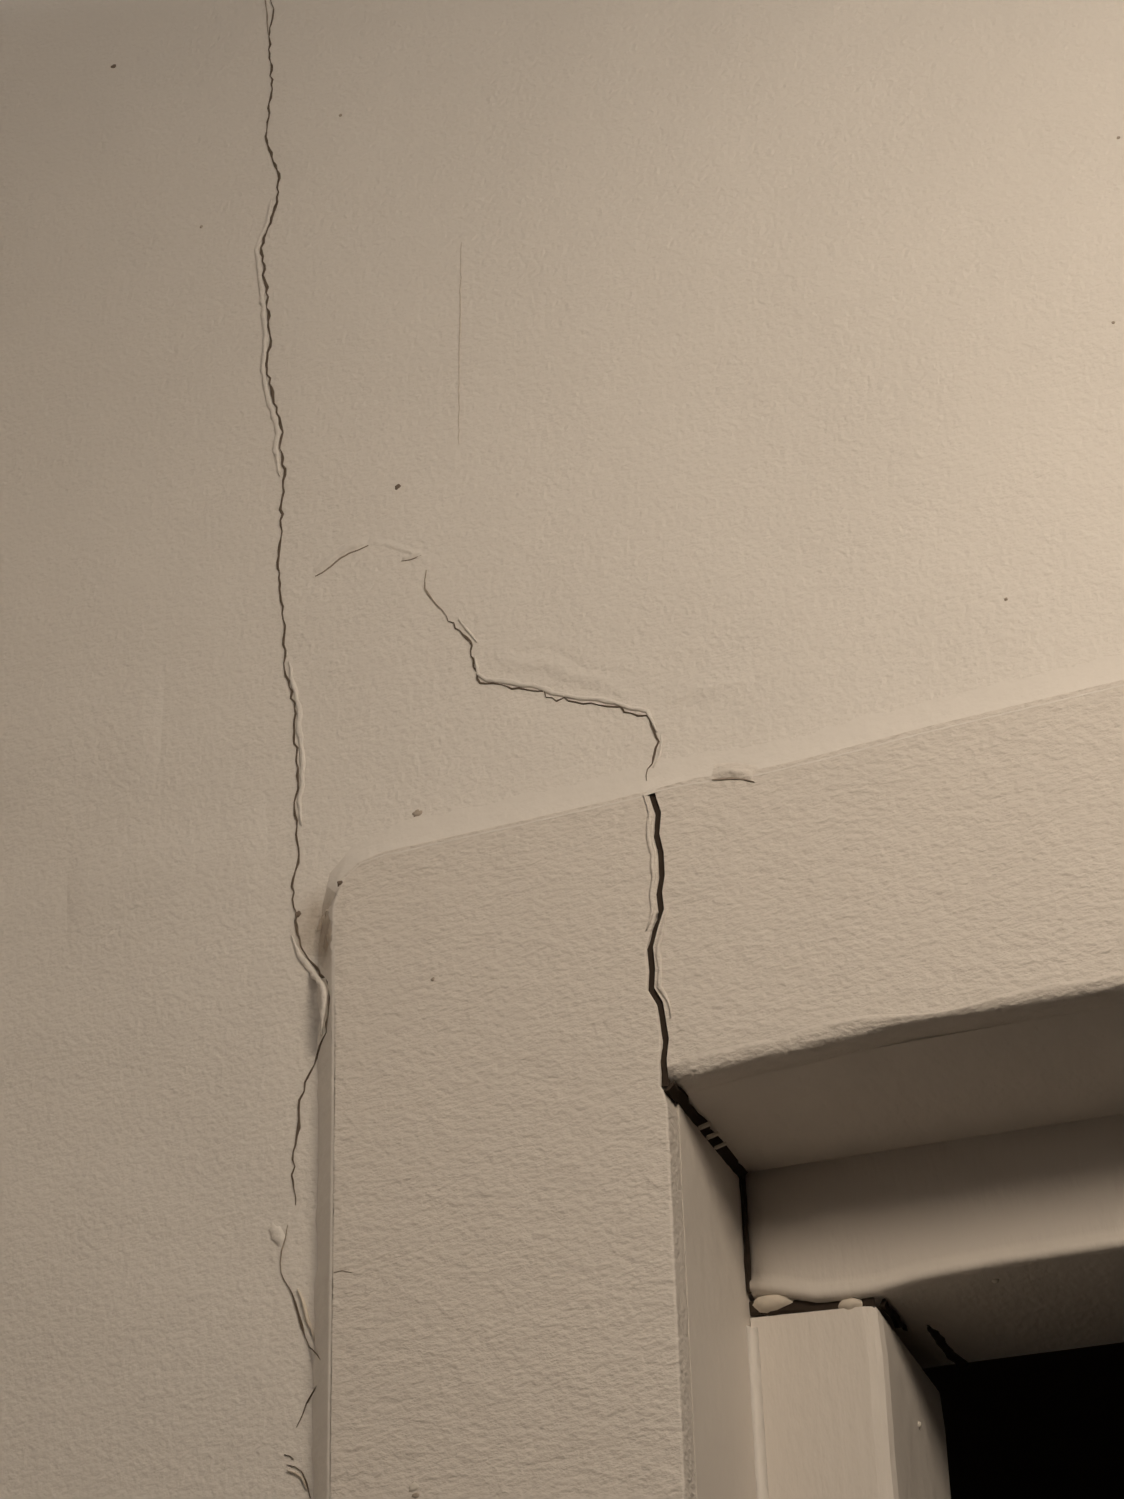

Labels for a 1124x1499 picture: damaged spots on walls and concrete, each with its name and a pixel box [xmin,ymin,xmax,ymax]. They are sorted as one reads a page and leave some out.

crack [254,0,330,1498]
crack [424,570,970,1368]